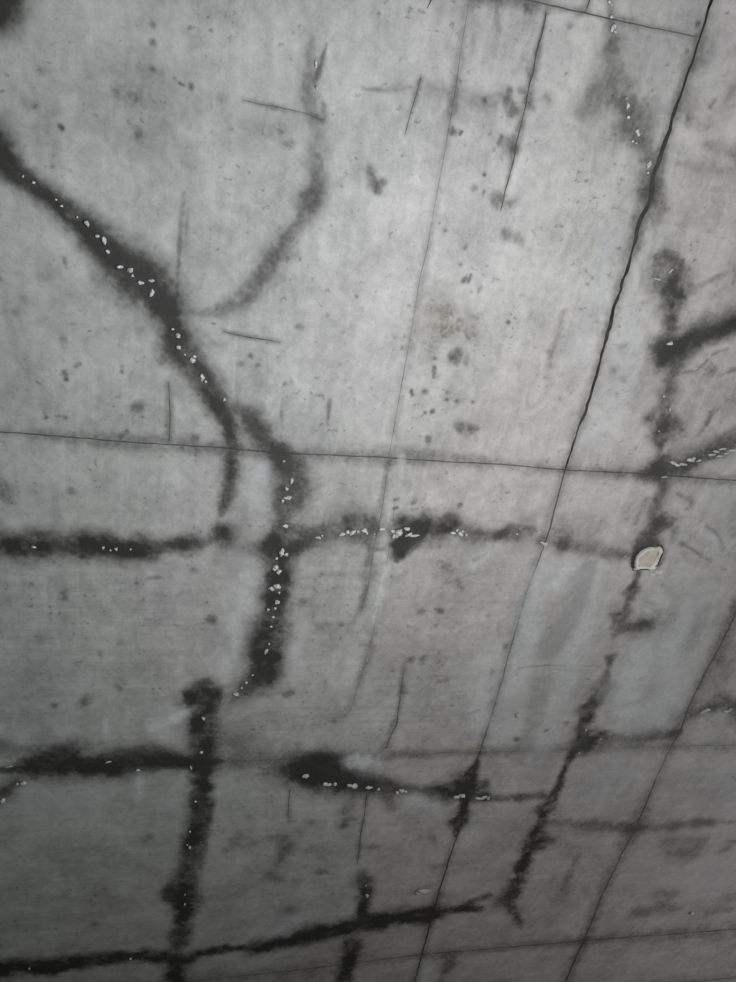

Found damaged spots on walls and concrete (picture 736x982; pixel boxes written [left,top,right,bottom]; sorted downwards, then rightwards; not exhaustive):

damp [0,0,24,32]
crack [500,13,547,211]
damp [0,129,530,982]
damp [540,538,577,552]
damp [613,251,736,631]
damp [279,694,613,924]